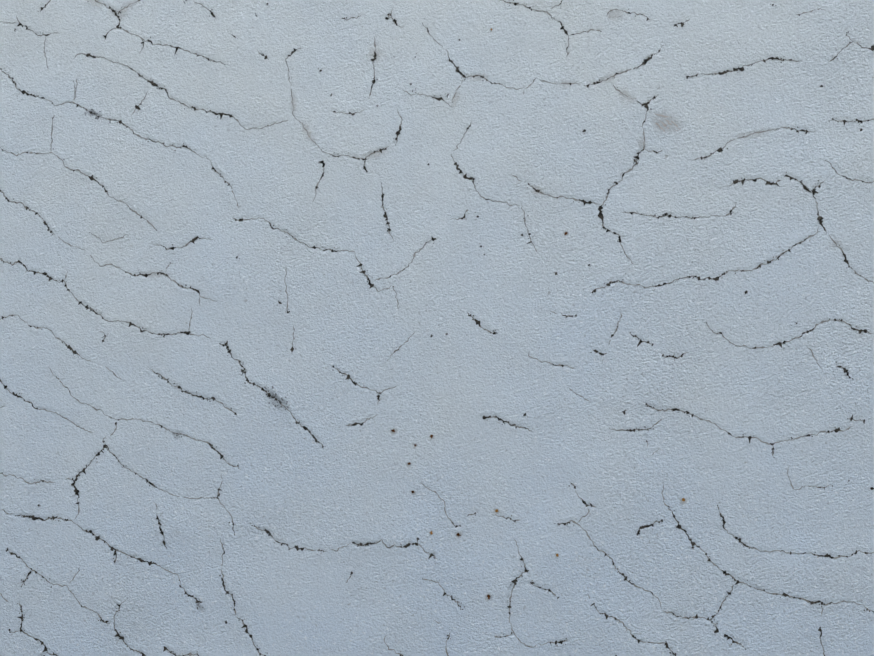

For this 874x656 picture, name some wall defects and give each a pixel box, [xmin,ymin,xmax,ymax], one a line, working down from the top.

crack [0,0,874,448]
crack [0,369,463,656]
crack [421,483,567,647]
crack [554,482,874,656]
crack [610,403,865,490]